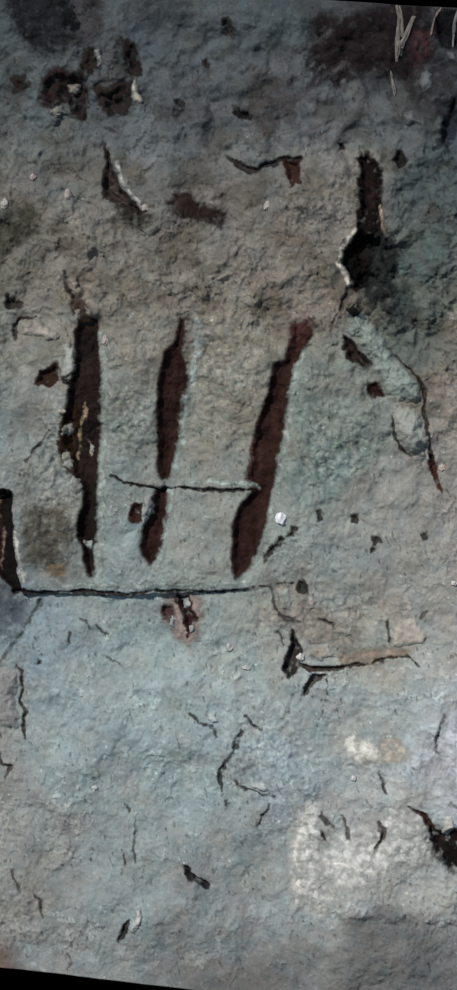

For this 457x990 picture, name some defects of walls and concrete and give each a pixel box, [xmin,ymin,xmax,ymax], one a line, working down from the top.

spalling [331,150,433,460]
crack [281,629,419,726]